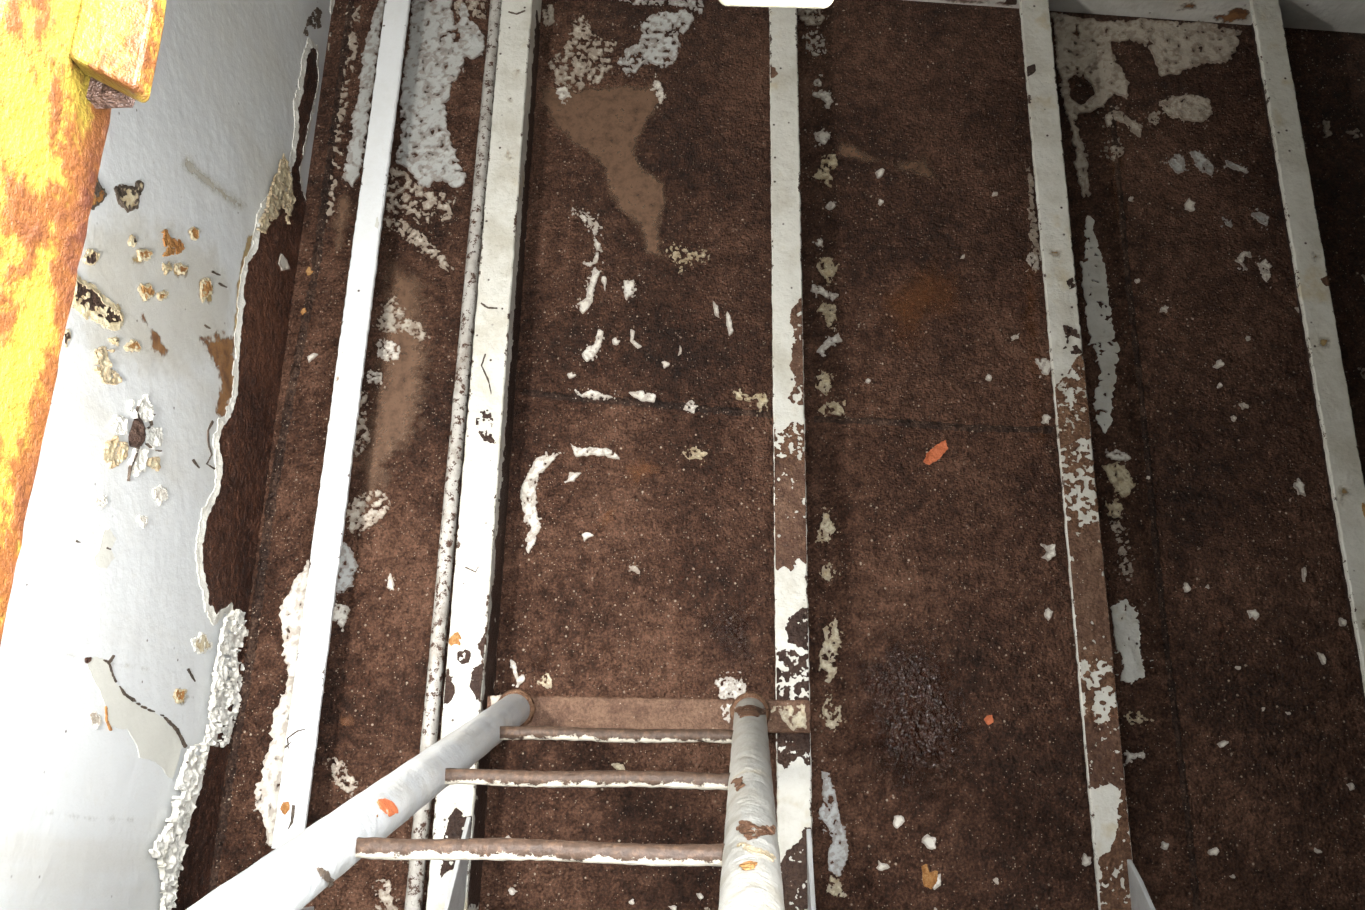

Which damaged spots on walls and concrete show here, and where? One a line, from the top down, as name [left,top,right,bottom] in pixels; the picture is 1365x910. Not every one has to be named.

peeling [548,15,630,77]
corrosion [91,177,107,210]
peeling [114,180,144,213]
peeling [375,167,458,239]
peeling [437,255,454,272]
peeling [93,346,123,385]
peeling [1109,513,1135,585]
peeling [85,609,249,910]
corrosion [478,751,491,769]
corrosion [777,733,811,769]
corrosion [443,785,488,839]
corrosion [440,860,483,908]